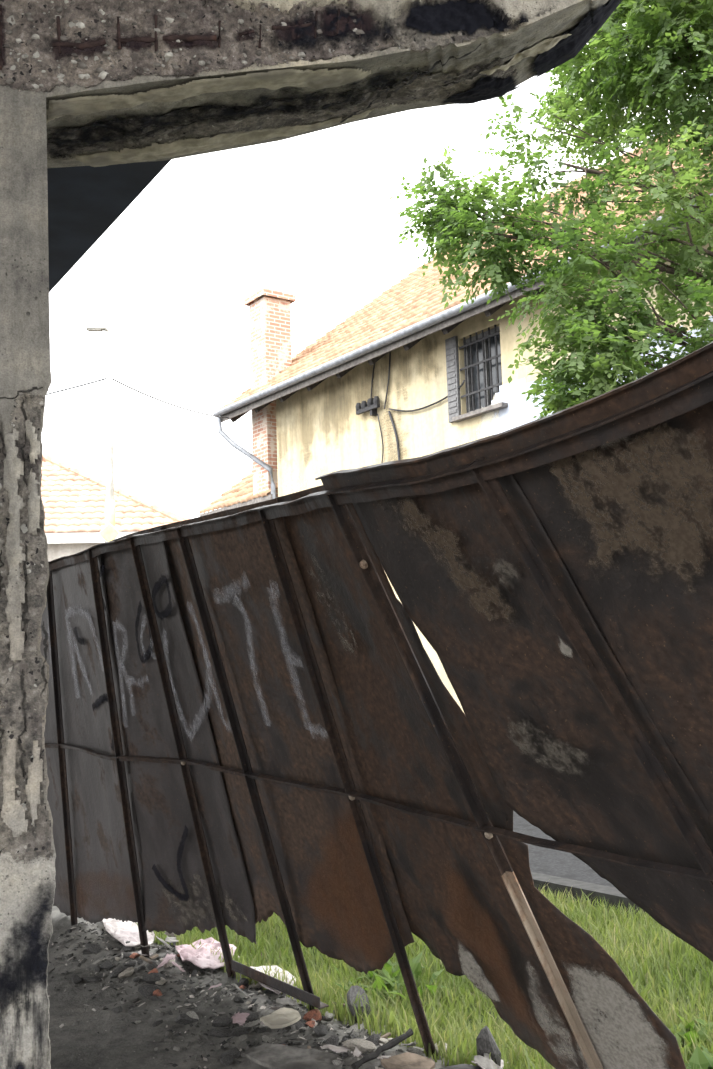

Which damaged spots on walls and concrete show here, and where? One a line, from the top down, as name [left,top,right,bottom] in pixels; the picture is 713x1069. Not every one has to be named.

spalling [0,0,572,167]
crack [0,387,43,487]
spalling [0,392,53,864]